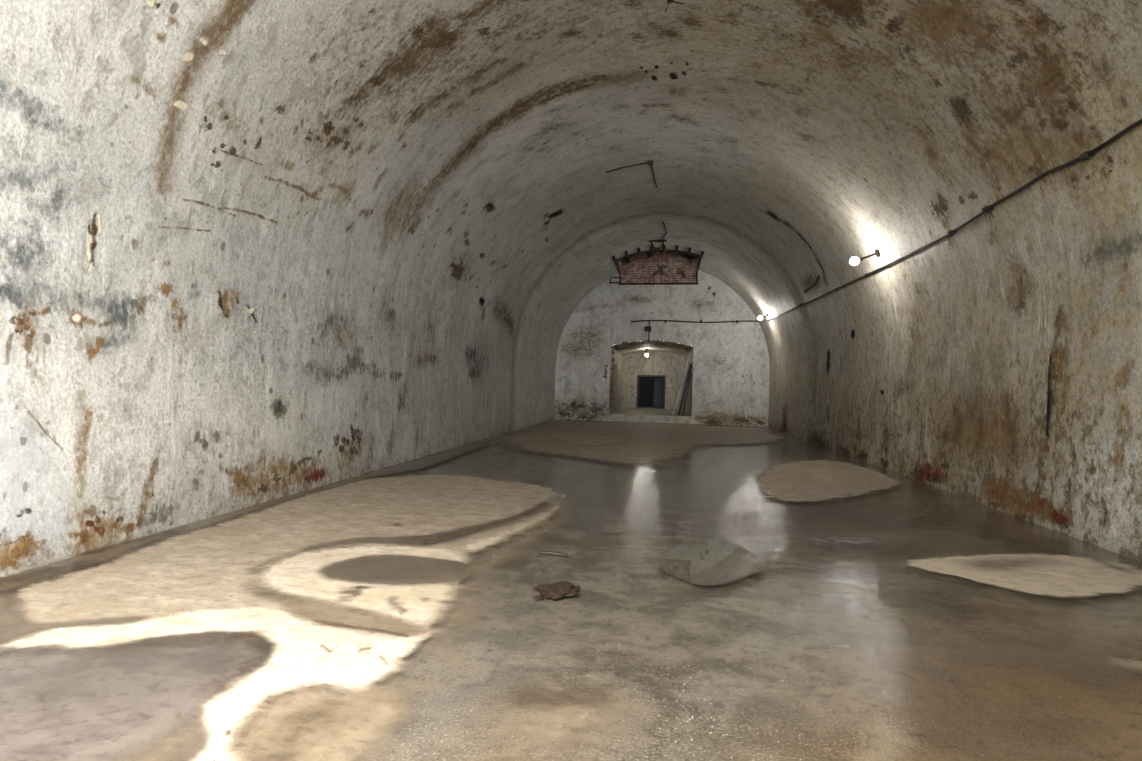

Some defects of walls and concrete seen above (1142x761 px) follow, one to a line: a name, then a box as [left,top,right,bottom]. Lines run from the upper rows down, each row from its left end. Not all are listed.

damp [172,0,252,116]
damp [305,0,527,158]
damp [798,0,873,25]
damp [886,0,1021,68]
damp [930,78,981,153]
damp [211,137,261,168]
damp [0,286,39,306]
crack [1007,263,1030,315]
damp [98,301,130,346]
crack [1032,307,1068,458]
spalling [0,529,46,571]